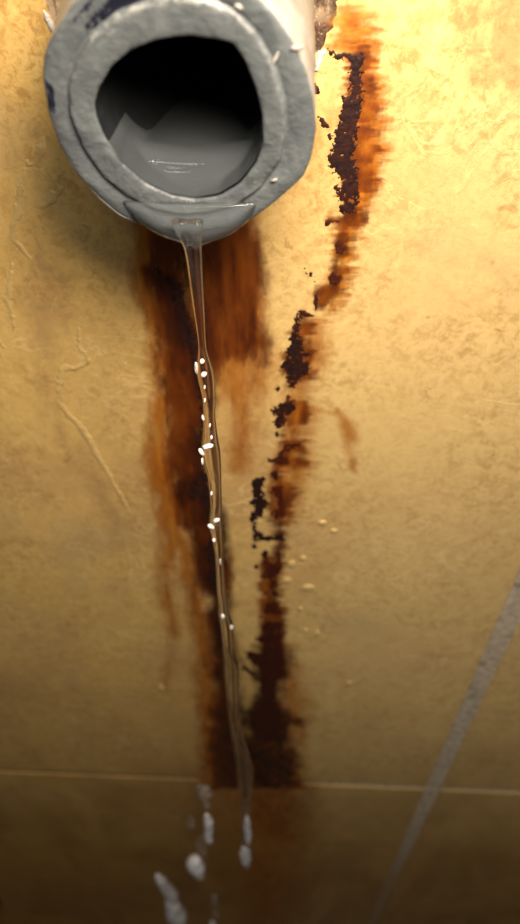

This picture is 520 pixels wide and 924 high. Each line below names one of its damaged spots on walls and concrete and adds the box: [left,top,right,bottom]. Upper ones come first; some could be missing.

spalling [42,0,61,32]
spalling [314,0,337,72]
corrosion [133,220,273,805]
corrosion [235,5,391,911]